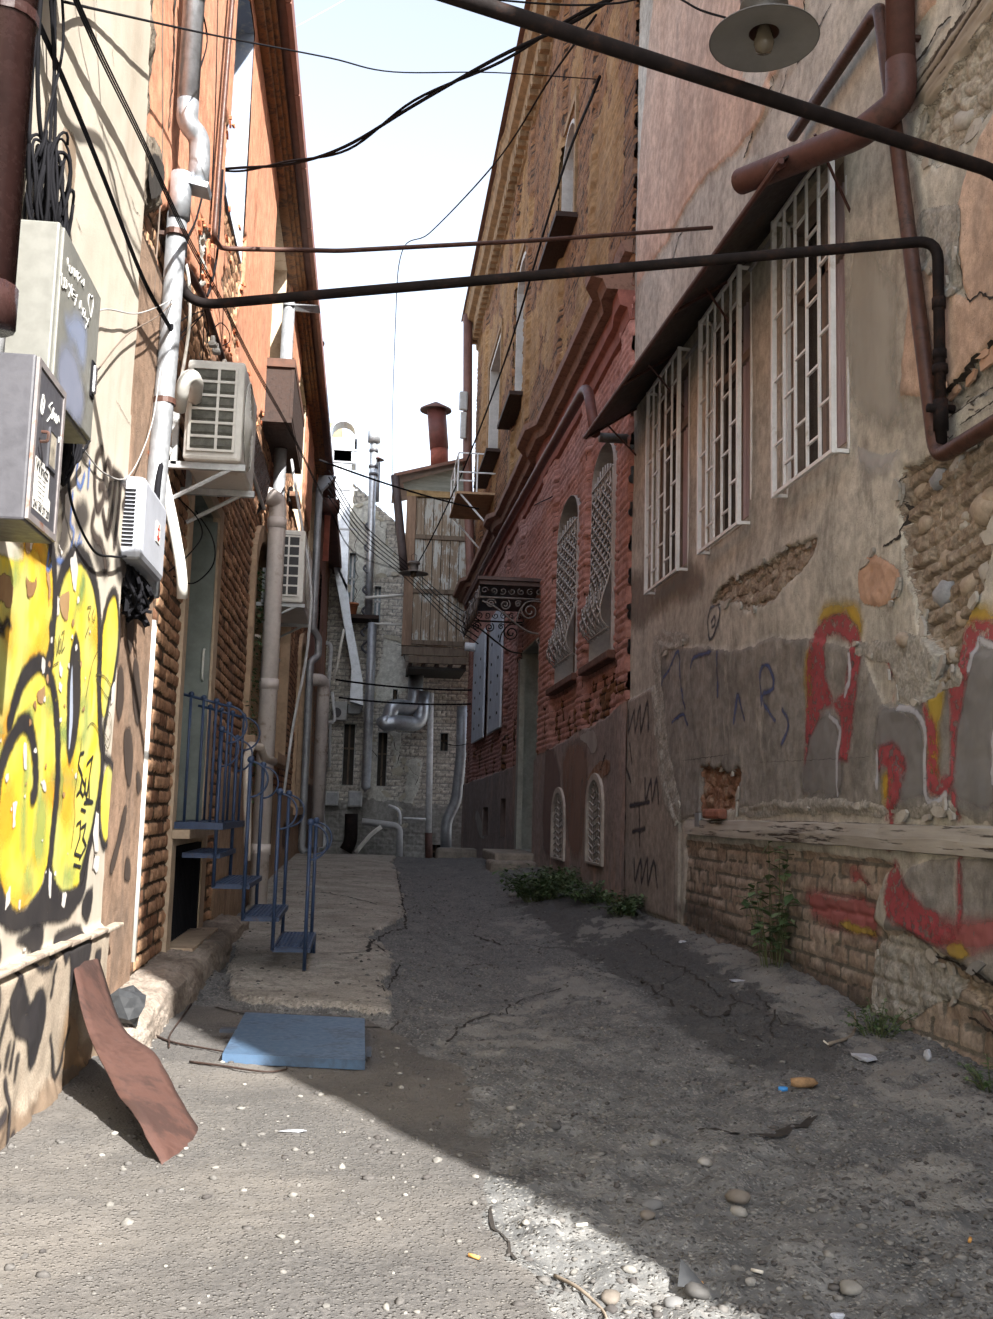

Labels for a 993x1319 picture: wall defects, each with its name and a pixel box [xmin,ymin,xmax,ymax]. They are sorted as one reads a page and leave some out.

spalling [913,18,993,170]
flaking render [916,203,963,298]
flaking render [946,340,993,439]
spalling [712,538,817,613]
flaking render [852,435,993,707]
spalling [651,629,689,826]
spalling [700,763,957,822]
crack [624,938,801,1043]